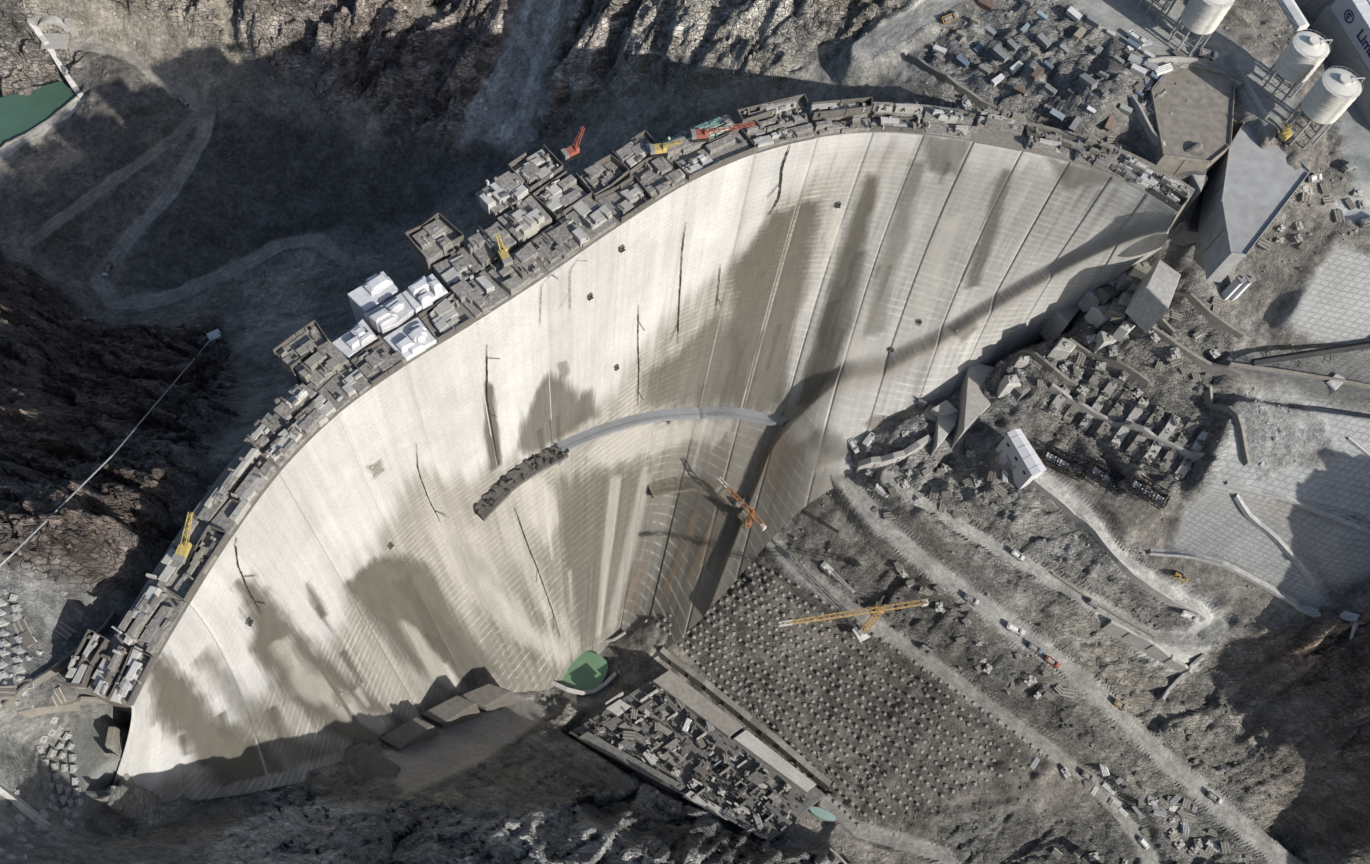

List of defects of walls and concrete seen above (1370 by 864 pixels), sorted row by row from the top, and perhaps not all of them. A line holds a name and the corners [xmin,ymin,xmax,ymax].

crack [638,222,687,400]
leakage [648,202,816,412]
crack [768,145,791,215]
leakage [799,177,876,405]
leakage [968,185,1005,287]
leakage [485,384,501,470]
leakage [521,377,594,452]
leakage [237,581,401,744]
leakage [347,557,496,697]